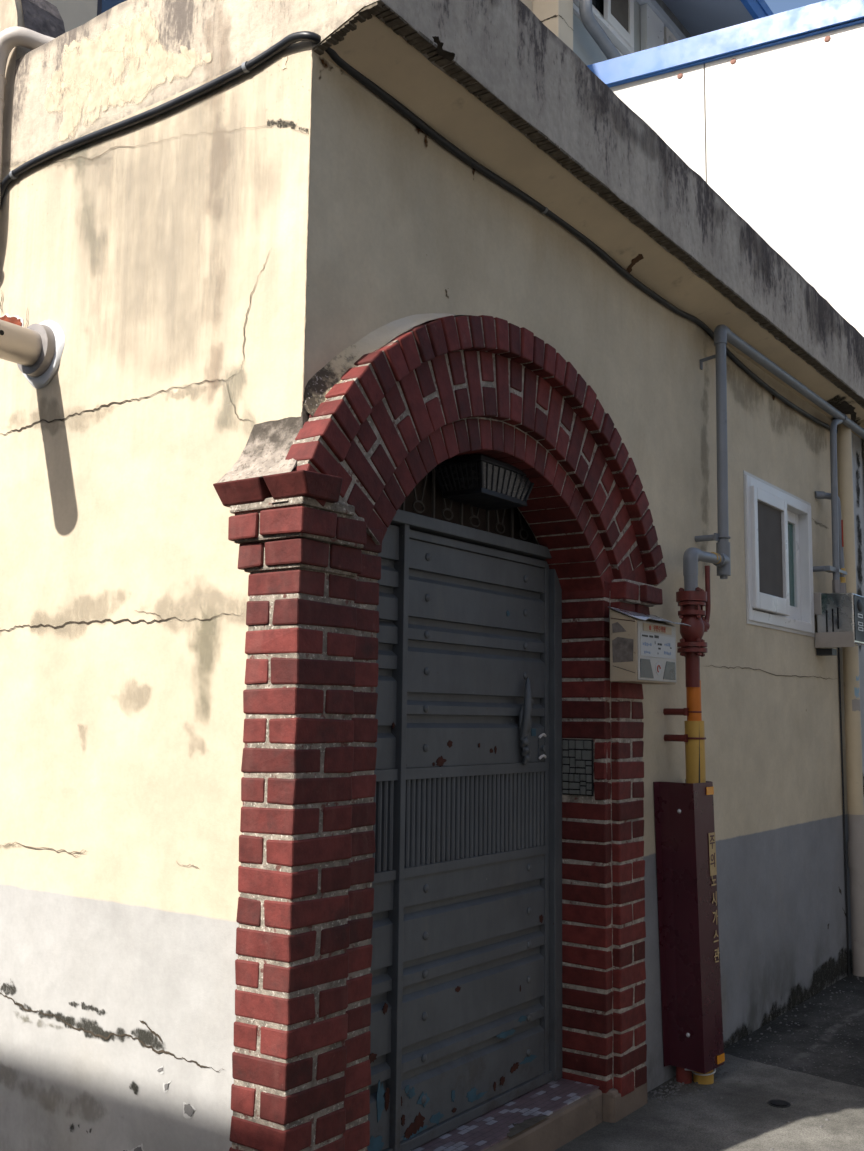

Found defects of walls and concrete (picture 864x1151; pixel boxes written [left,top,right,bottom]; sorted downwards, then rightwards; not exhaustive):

peeling [44,9,211,140]
crack [1,248,272,435]
spalling [827,395,860,425]
crack [0,610,243,670]
crack [0,982,224,1072]
water stain [723,948,852,1049]